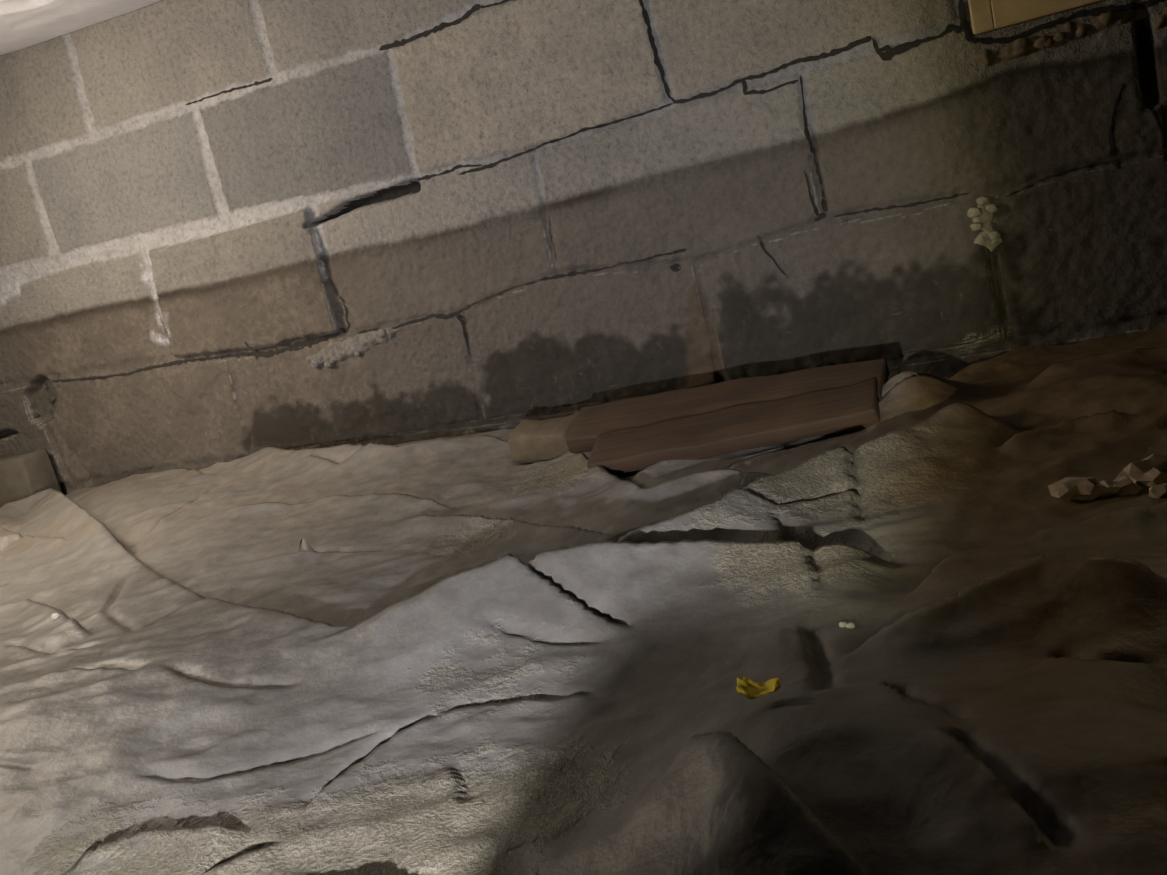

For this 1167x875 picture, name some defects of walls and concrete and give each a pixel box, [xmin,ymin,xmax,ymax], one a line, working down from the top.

crack [379,0,514,51]
crack [186,78,272,105]
water stain [0,46,1167,495]
crack [757,235,788,277]
crack [52,220,686,383]